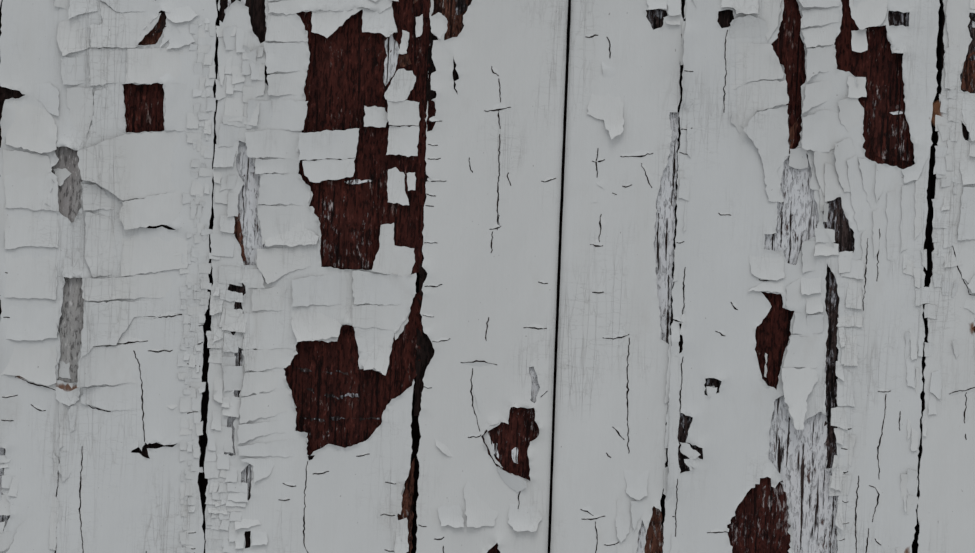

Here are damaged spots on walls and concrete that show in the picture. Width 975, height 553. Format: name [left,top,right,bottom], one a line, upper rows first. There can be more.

peeling [0,0,472,553]
peeling [437,366,542,532]
peeling [615,112,703,553]
peeling [704,378,721,398]
peeling [717,0,975,553]